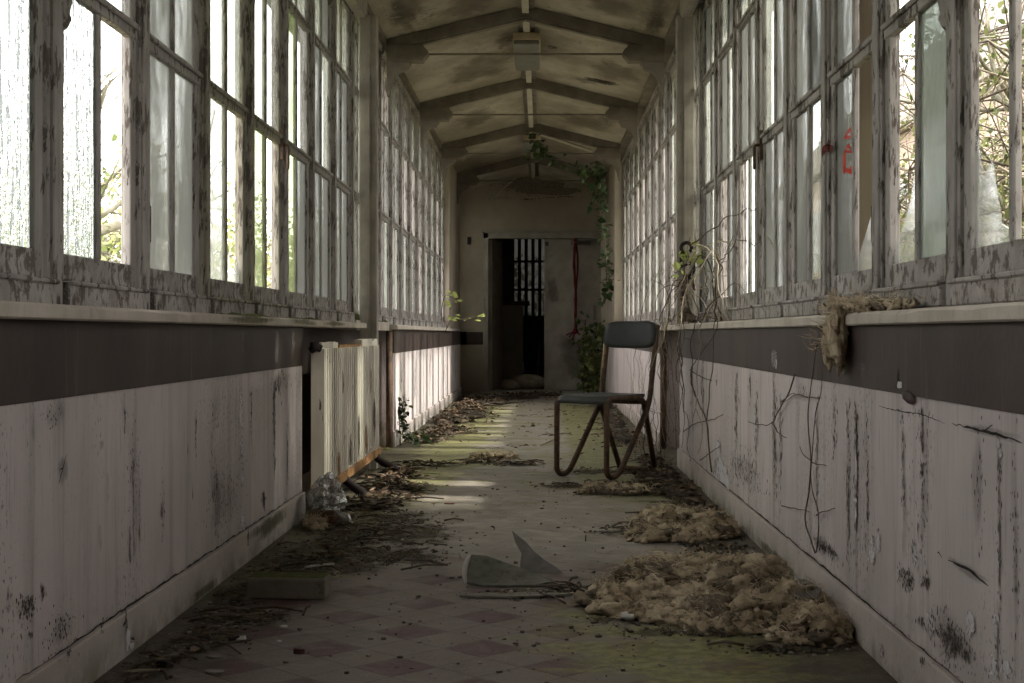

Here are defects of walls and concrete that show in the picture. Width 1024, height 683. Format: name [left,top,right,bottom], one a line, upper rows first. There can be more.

damp [730,370,783,505]
damp [810,388,870,573]
damp [917,410,929,530]
crack [881,406,1022,447]
damp [971,415,1021,617]
damp [897,561,929,593]
crack [937,552,988,586]
damp [7,587,84,663]
damp [915,604,976,675]